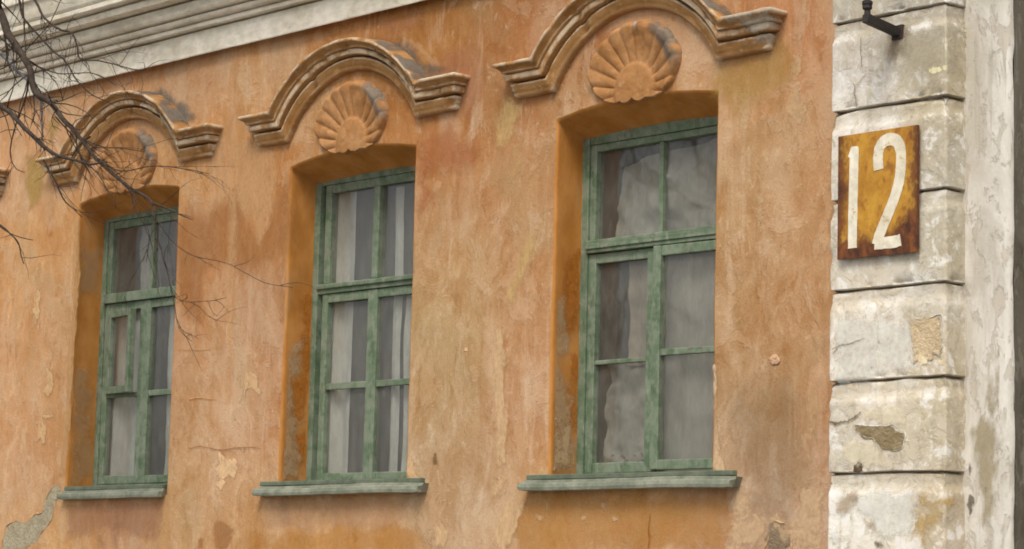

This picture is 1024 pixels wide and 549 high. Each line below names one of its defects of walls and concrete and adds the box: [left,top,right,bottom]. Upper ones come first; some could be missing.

peeling [837,314,944,386]
spalling [855,424,906,451]
peeling [215,451,238,490]
spalling [1,485,61,549]
peeling [726,489,838,549]
peeling [857,489,919,535]